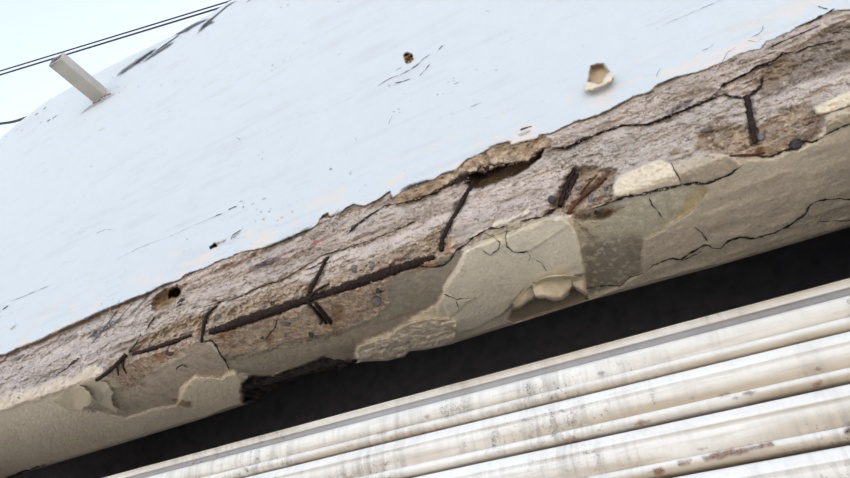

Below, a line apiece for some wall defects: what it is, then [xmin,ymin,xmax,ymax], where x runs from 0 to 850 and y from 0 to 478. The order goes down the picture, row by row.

crack [197,161,526,309]
crack [420,207,558,271]
flaking render [393,10,850,252]
crack [593,163,740,217]
crack [556,6,850,150]
crack [587,198,850,289]
crack [757,124,850,158]
spalling [54,227,463,419]